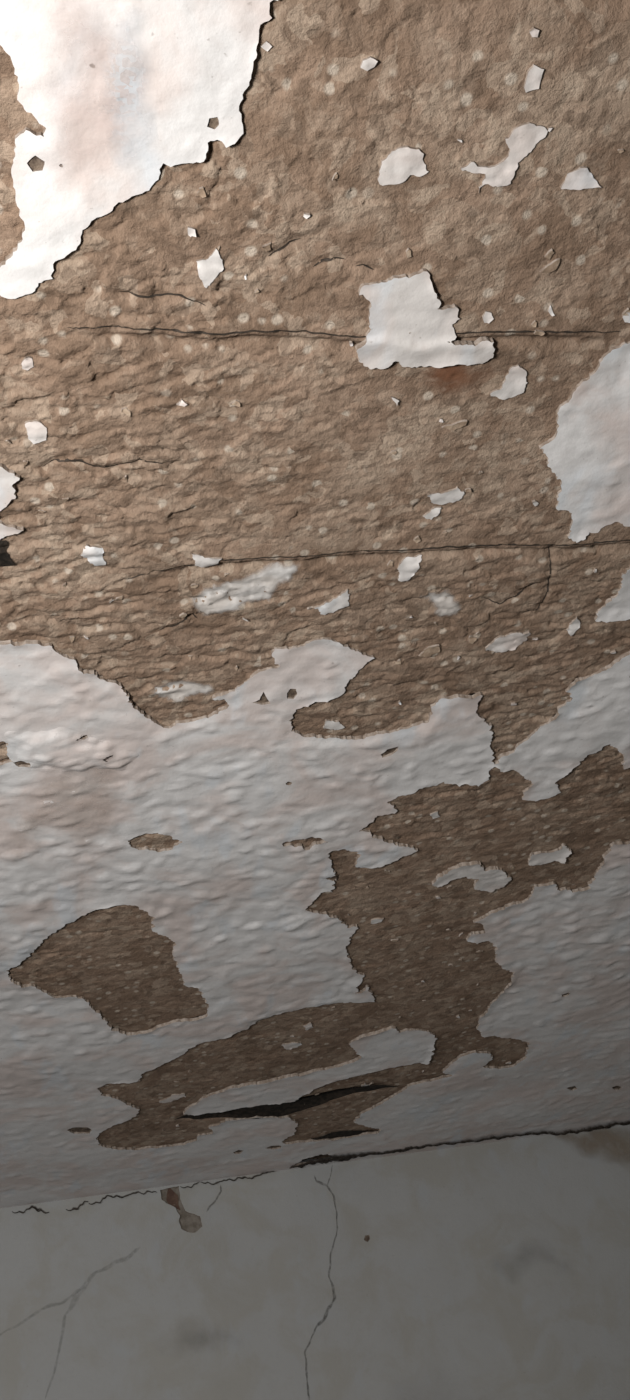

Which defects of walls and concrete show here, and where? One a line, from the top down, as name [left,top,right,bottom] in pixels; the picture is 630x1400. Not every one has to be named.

peeling [0,0,630,761]
peeling [0,741,30,765]
peeling [9,905,208,1033]
peeling [97,744,630,1148]
crack [13,1085,630,1396]